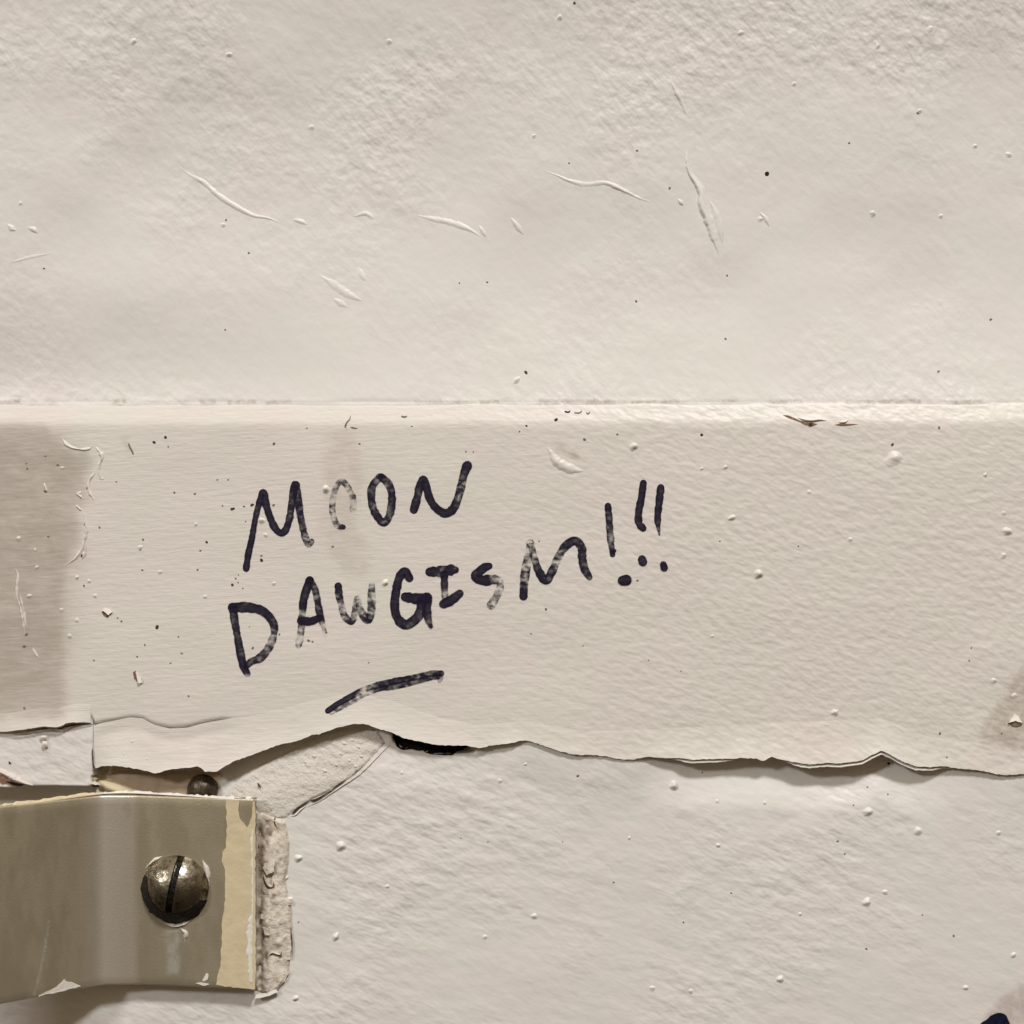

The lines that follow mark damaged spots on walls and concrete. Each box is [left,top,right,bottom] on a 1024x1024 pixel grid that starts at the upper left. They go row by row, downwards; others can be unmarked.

peeling [0,693,1024,998]